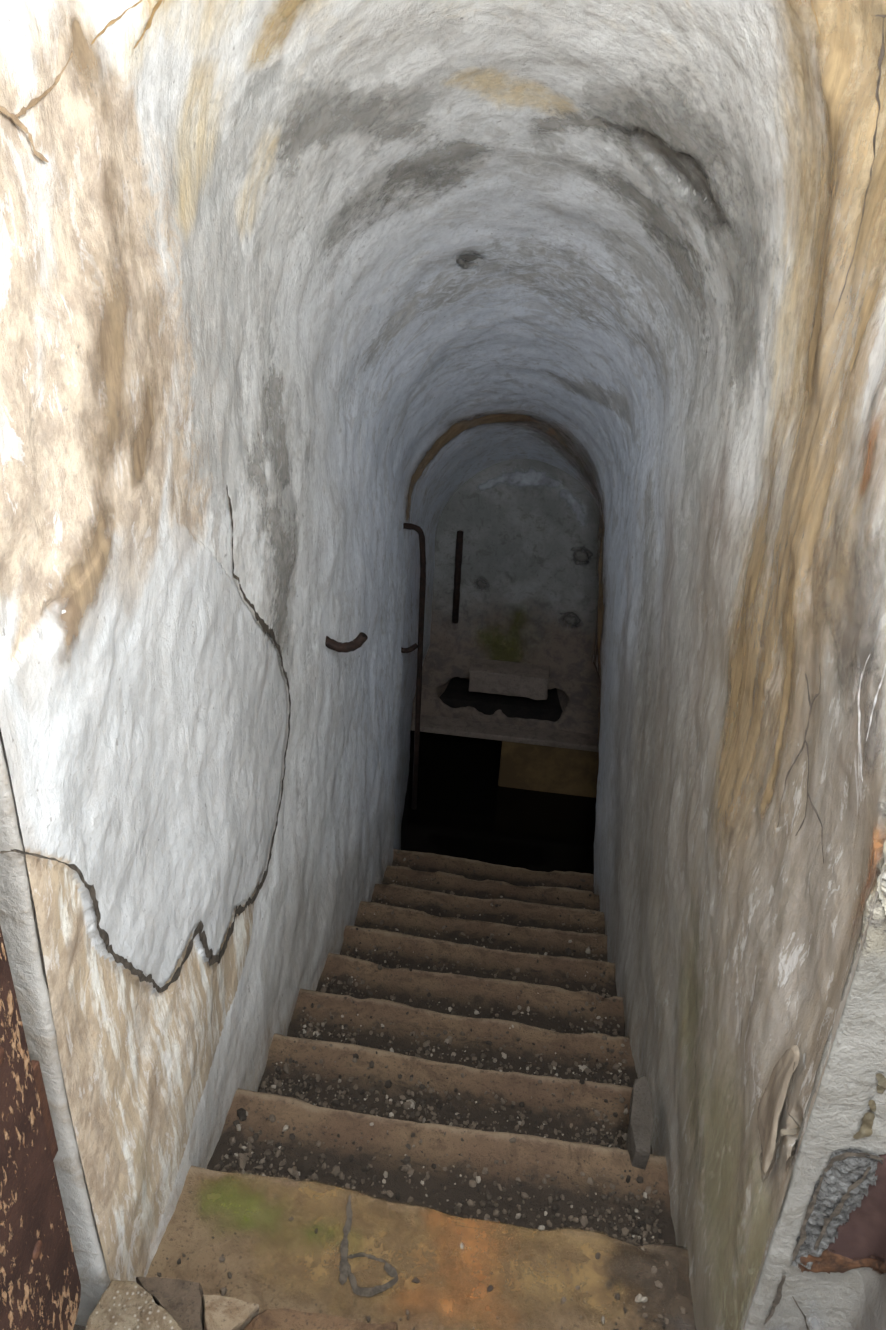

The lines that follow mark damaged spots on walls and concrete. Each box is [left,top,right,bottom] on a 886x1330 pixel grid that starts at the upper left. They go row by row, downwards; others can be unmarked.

crack [0,0,162,163]
water stain [70,19,102,90]
water stain [278,96,425,177]
water stain [386,141,489,202]
water stain [533,85,758,389]
water stain [94,258,156,484]
water stain [865,321,886,419]
water stain [58,512,113,650]
crack [0,487,291,993]
crack [777,665,824,863]
spalling [877,840,886,915]
spalling [790,1073,886,1275]